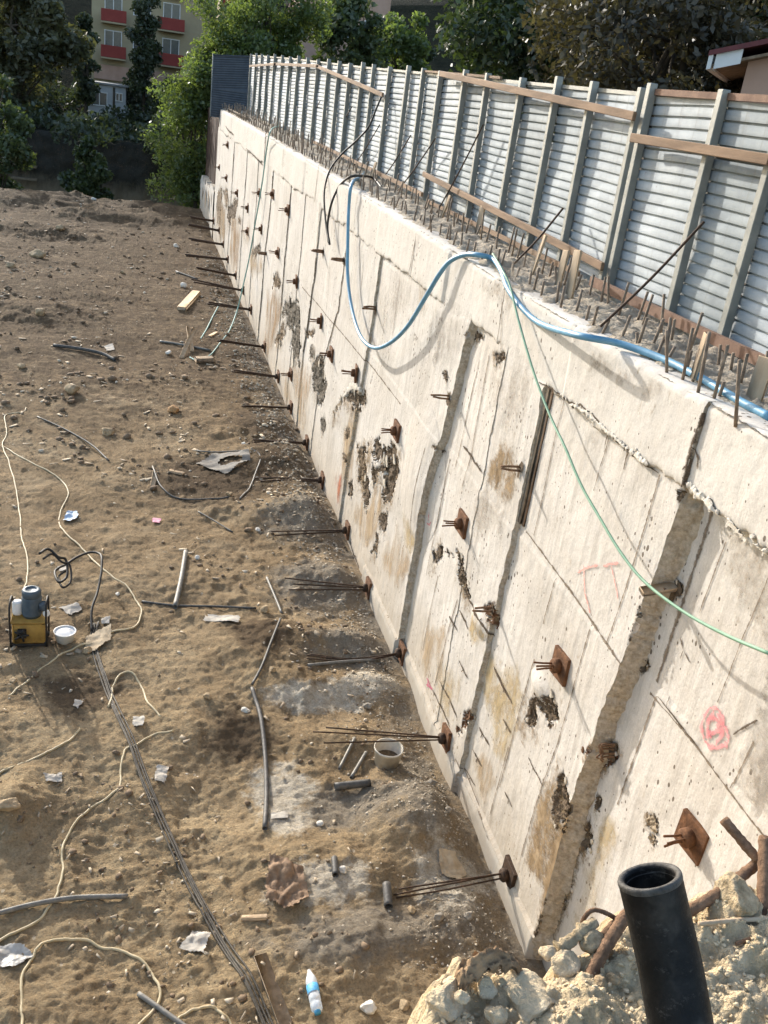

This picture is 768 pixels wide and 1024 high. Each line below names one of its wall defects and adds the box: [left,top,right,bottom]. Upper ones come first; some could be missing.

spalling [272,273,291,347]
crack [539,382,706,487]
spalling [342,427,401,558]
spalling [430,546,471,606]
spalling [456,710,476,735]
spalling [644,813,658,845]